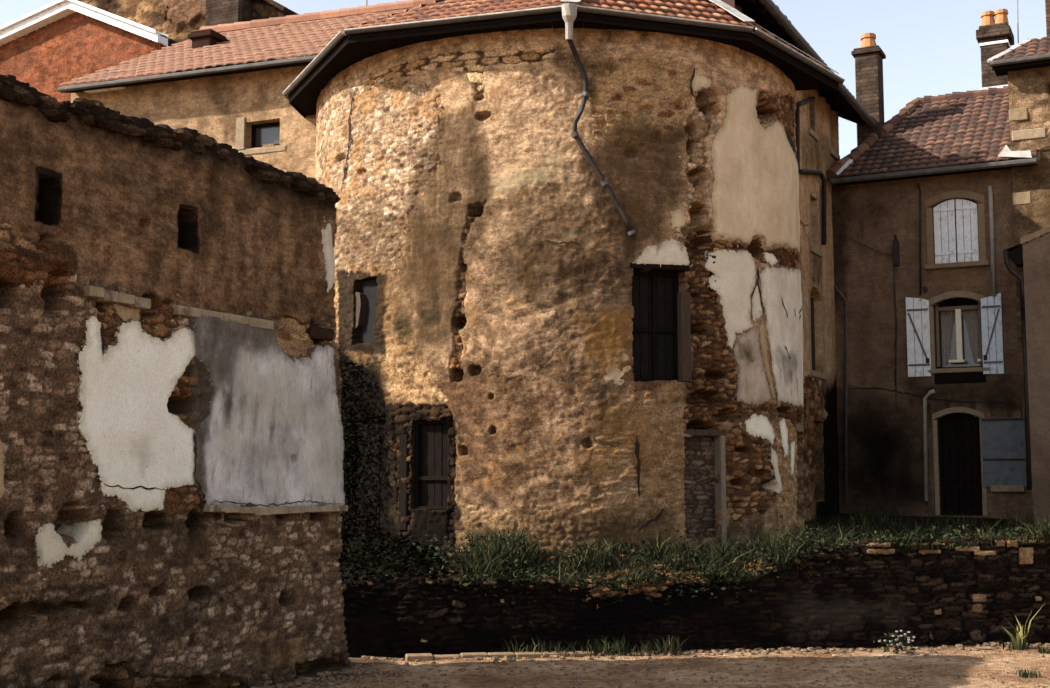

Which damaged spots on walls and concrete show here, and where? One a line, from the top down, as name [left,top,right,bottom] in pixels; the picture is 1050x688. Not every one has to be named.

flaking render [0,440,14,499]
flaking render [26,292,345,580]
leakage [168,315,275,484]
leakage [410,104,486,342]
crack [599,436,664,534]
flaking render [579,53,828,527]